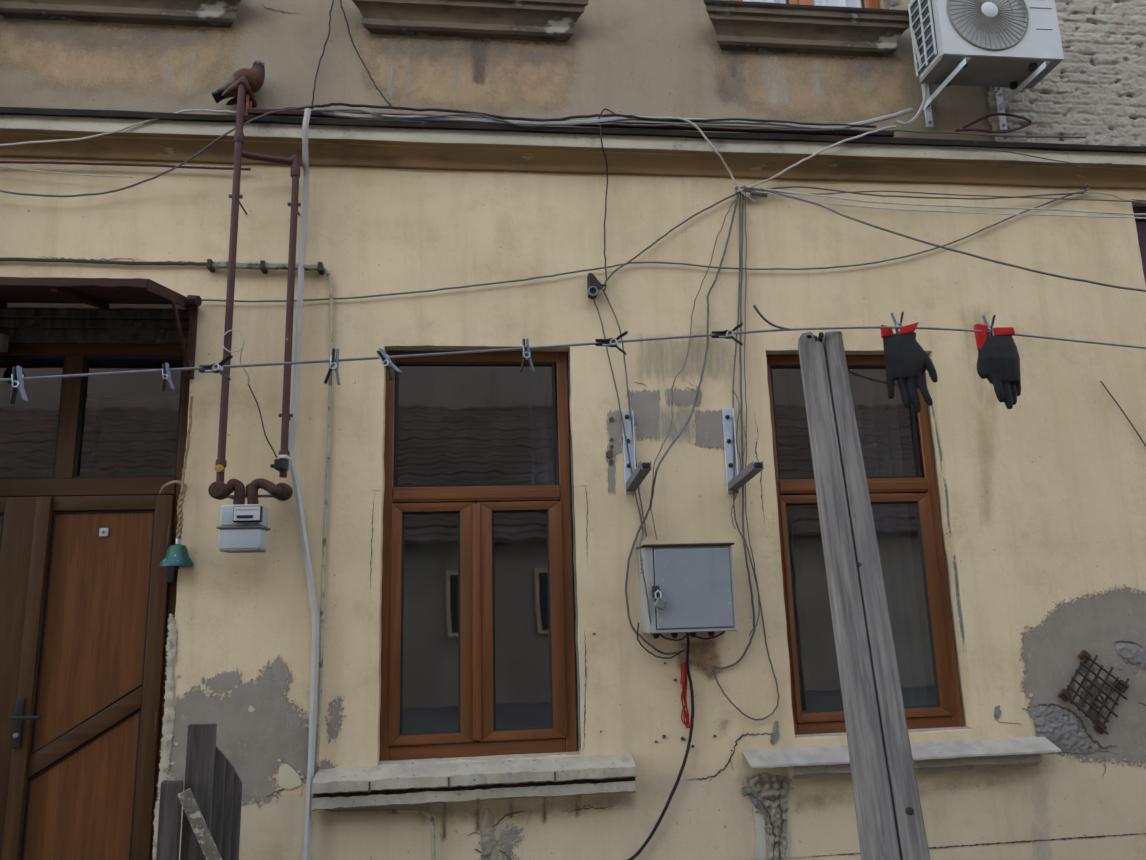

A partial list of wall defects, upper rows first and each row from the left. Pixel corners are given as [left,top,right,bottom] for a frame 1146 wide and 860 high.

leakage [0,21,229,95]
peeling [605,386,724,495]
peeling [1019,584,1146,769]
peeling [152,613,347,860]
spalling [740,772,794,860]